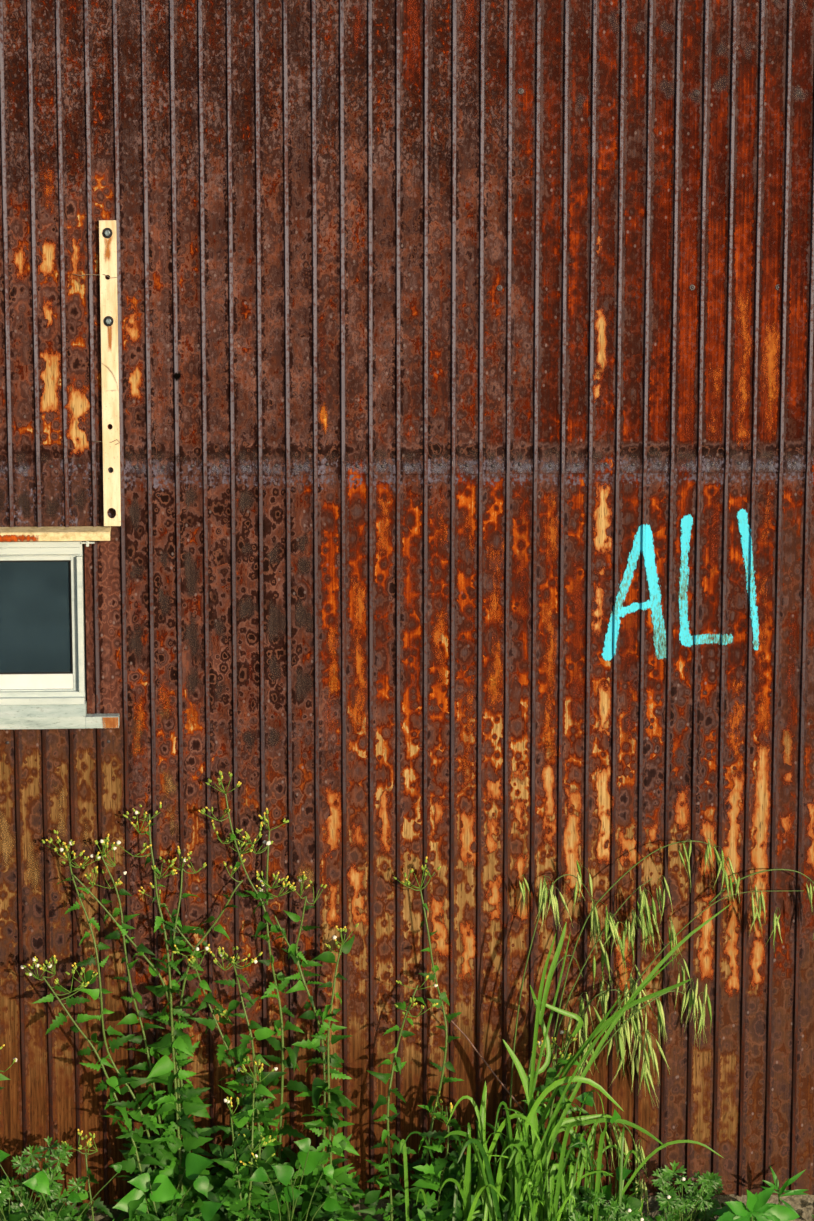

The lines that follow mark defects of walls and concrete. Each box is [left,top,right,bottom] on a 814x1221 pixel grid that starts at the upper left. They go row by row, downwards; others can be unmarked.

peeling [13,237,82,283]
peeling [39,348,92,456]
corrosion [736,293,782,445]
peeling [591,481,613,636]
corrosion [328,625,338,692]
corrosion [350,579,369,728]
corrosion [462,637,503,770]
corrosion [519,550,560,758]
corrosion [729,676,769,756]
peeling [325,784,392,859]
peeling [540,742,662,898]
peeling [674,729,814,997]